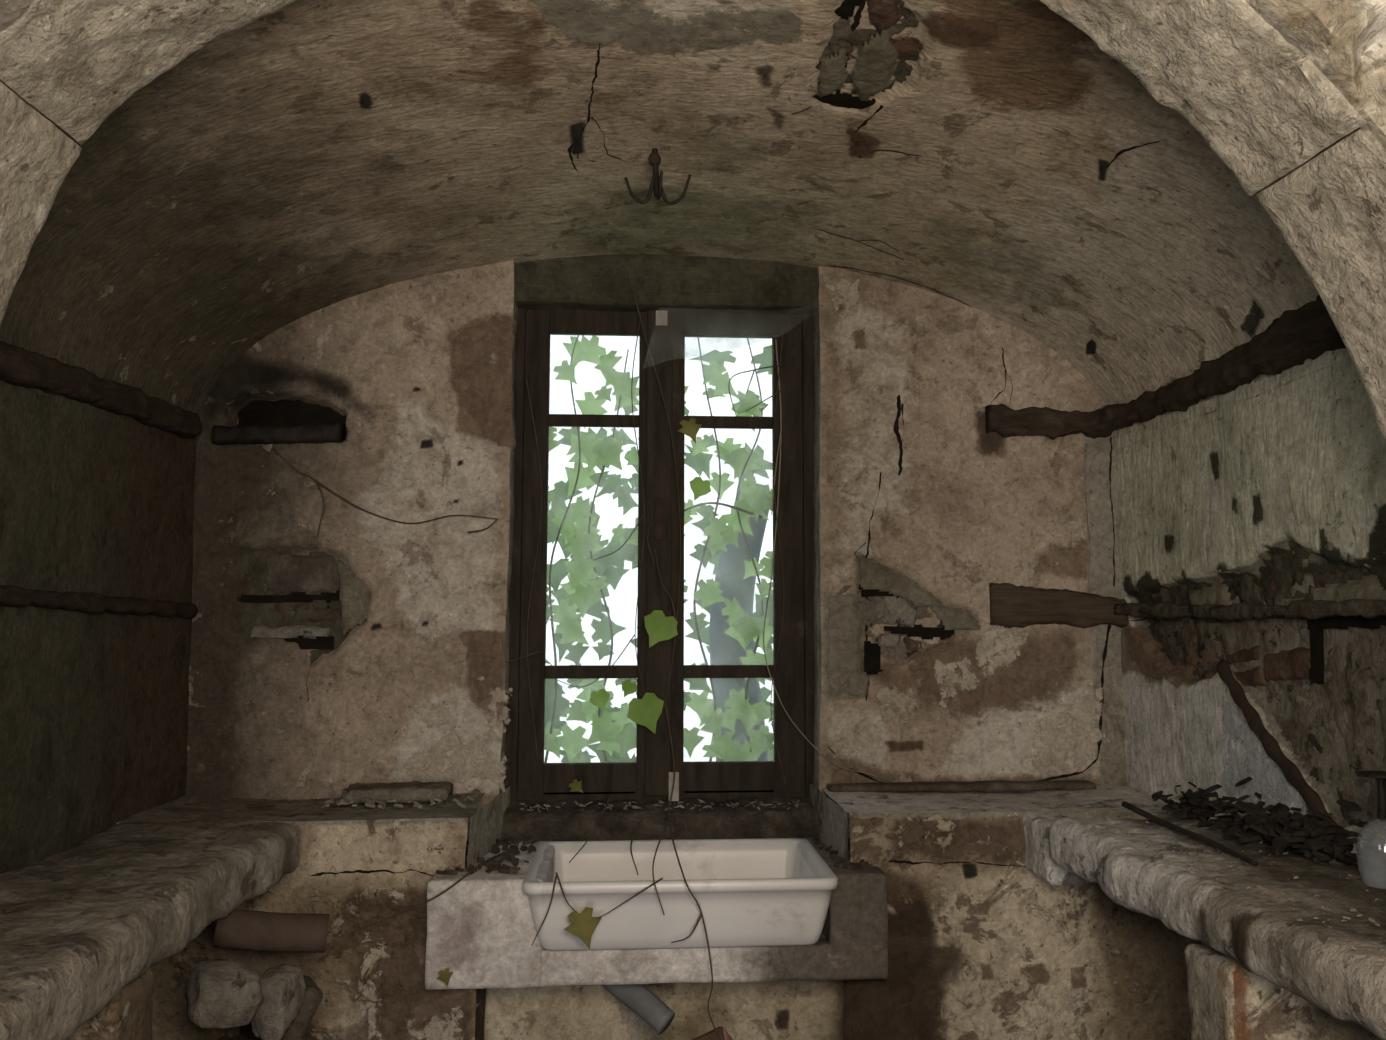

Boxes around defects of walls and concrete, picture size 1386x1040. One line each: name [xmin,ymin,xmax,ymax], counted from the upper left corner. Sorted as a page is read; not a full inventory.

crack [567,41,622,171]
peeling [847,129,880,158]
spalling [812,0,923,109]
spalling [236,550,381,665]
crack [828,747,885,783]
spalling [838,555,1028,725]
peeling [1028,687,1106,771]
crack [1043,437,1147,780]
flaking render [1125,540,1386,823]